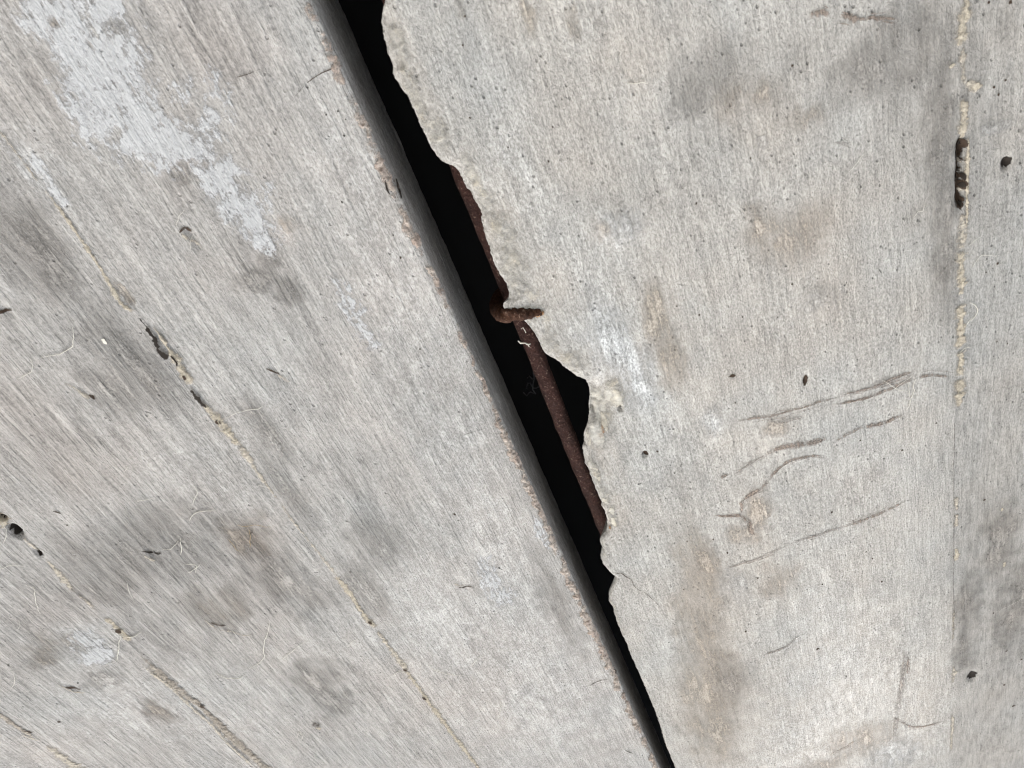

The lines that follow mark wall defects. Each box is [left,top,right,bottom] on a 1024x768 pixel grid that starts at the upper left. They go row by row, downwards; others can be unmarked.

leakage [10,0,285,257]
spalling [354,103,451,309]
spalling [388,25,448,151]
spalling [507,278,582,372]
spalling [457,324,659,768]